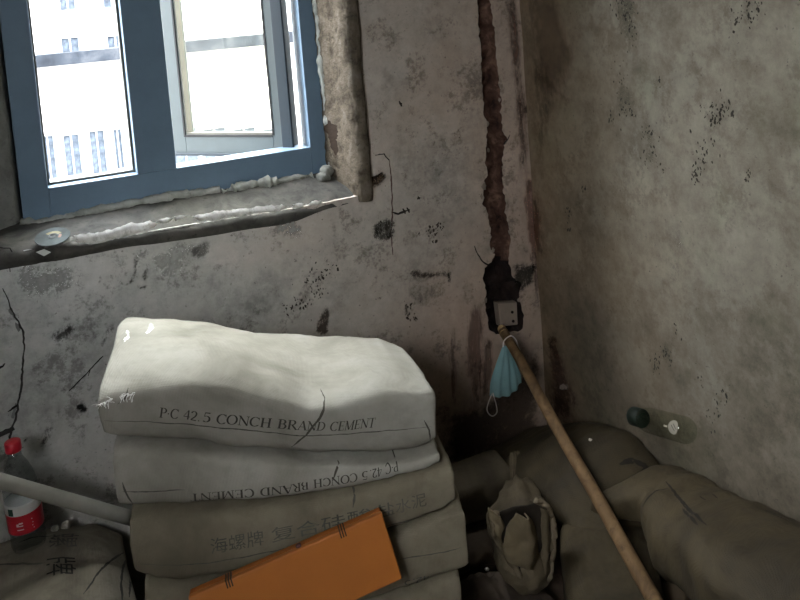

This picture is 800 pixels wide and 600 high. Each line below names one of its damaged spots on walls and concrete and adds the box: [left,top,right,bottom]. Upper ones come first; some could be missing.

water stain [700,99,734,127]
water stain [691,138,721,185]
crack [375,153,408,254]
water stain [282,259,339,316]
crack [0,247,25,439]
water stain [317,309,329,335]